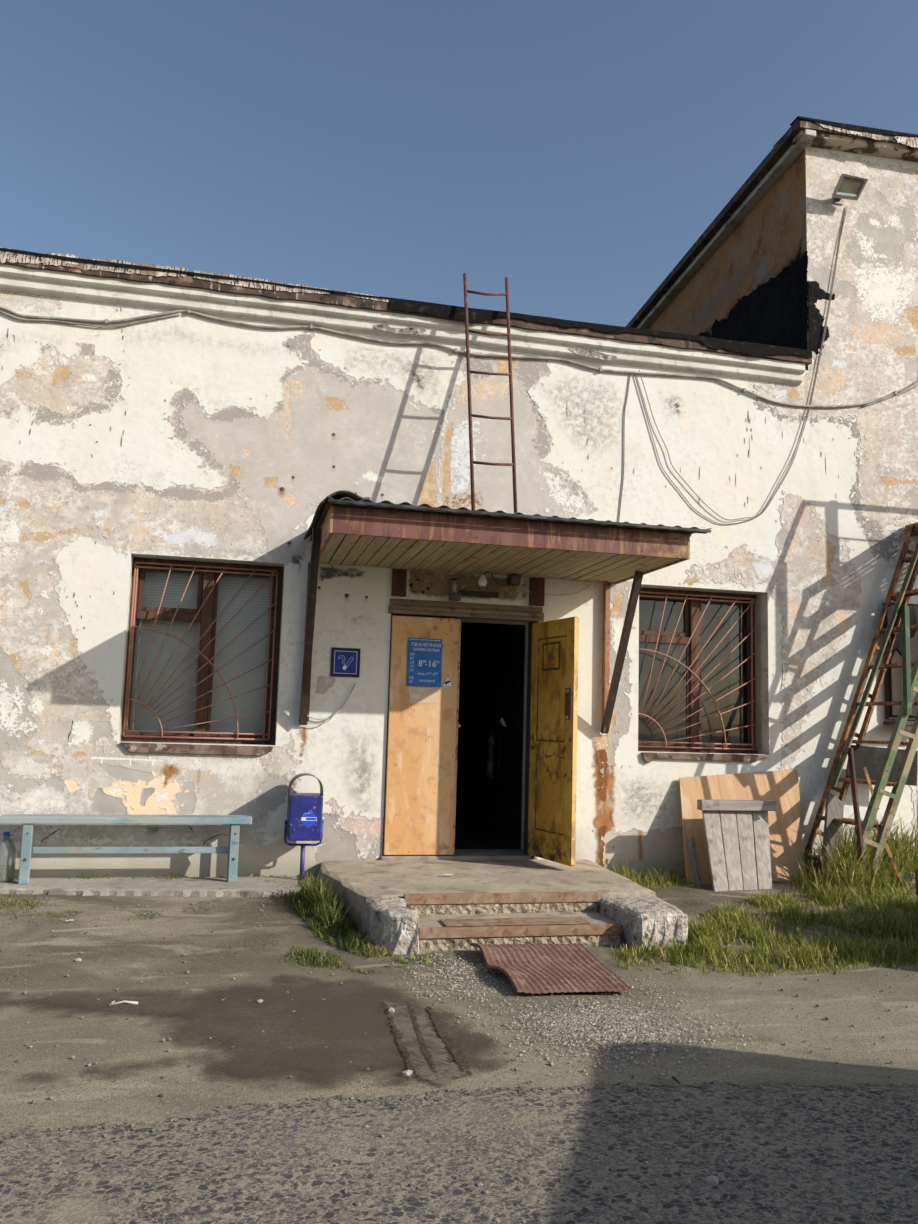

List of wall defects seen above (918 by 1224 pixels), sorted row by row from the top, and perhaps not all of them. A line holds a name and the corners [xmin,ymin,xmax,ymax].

peeling [815,122,918,148]
spalling [374,323,427,335]
peeling [737,147,918,567]
peeling [0,329,602,847]
peeling [680,479,863,770]
spalling [326,798,383,858]
rust [591,734,615,867]